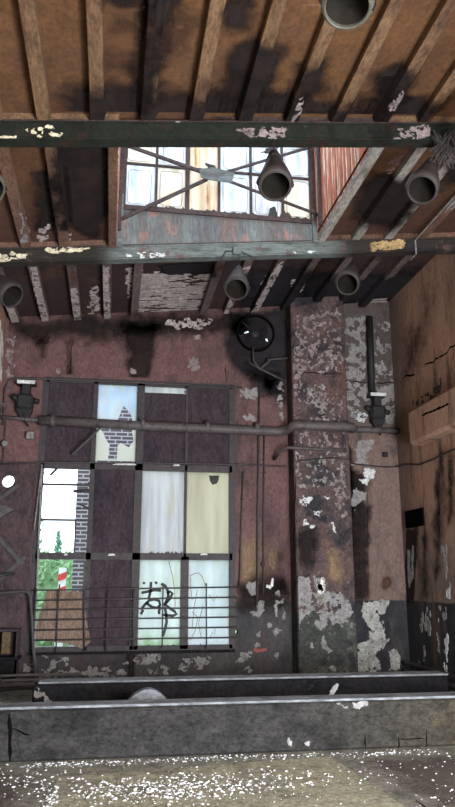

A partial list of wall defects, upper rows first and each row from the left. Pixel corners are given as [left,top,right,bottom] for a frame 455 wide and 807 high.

leakage [63,0,441,123]
peeling [236,97,304,139]
peeling [0,251,49,321]
peeling [19,211,90,254]
leakage [159,263,216,278]
leakage [9,267,420,378]
leakage [245,371,287,402]
peeling [276,307,395,425]
peeling [369,239,406,252]
peeling [295,431,376,533]
peeling [235,578,286,673]
peeling [298,575,401,672]